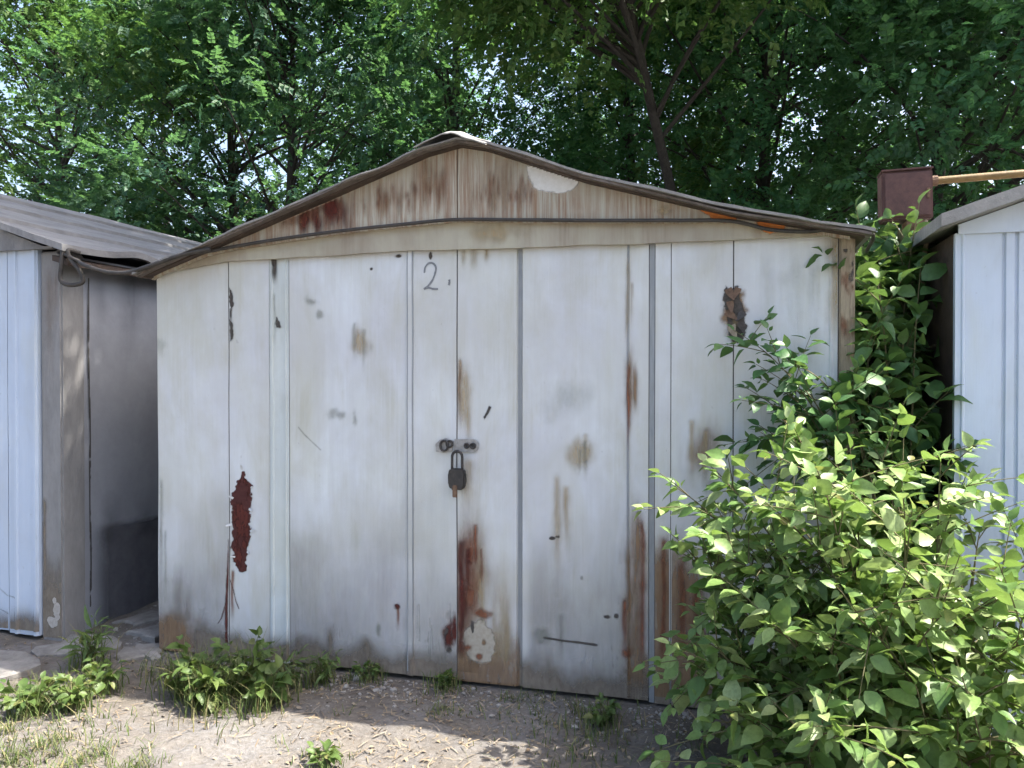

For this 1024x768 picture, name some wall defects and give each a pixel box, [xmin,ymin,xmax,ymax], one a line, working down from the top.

peeling [527,166,578,193]
corrosion [291,199,346,232]
peeling [724,287,747,338]
corrosion [627,364,637,424]
spalling [47,597,60,628]
corrosion [443,525,520,686]
corrosion [623,518,708,701]
peeling [463,620,495,663]